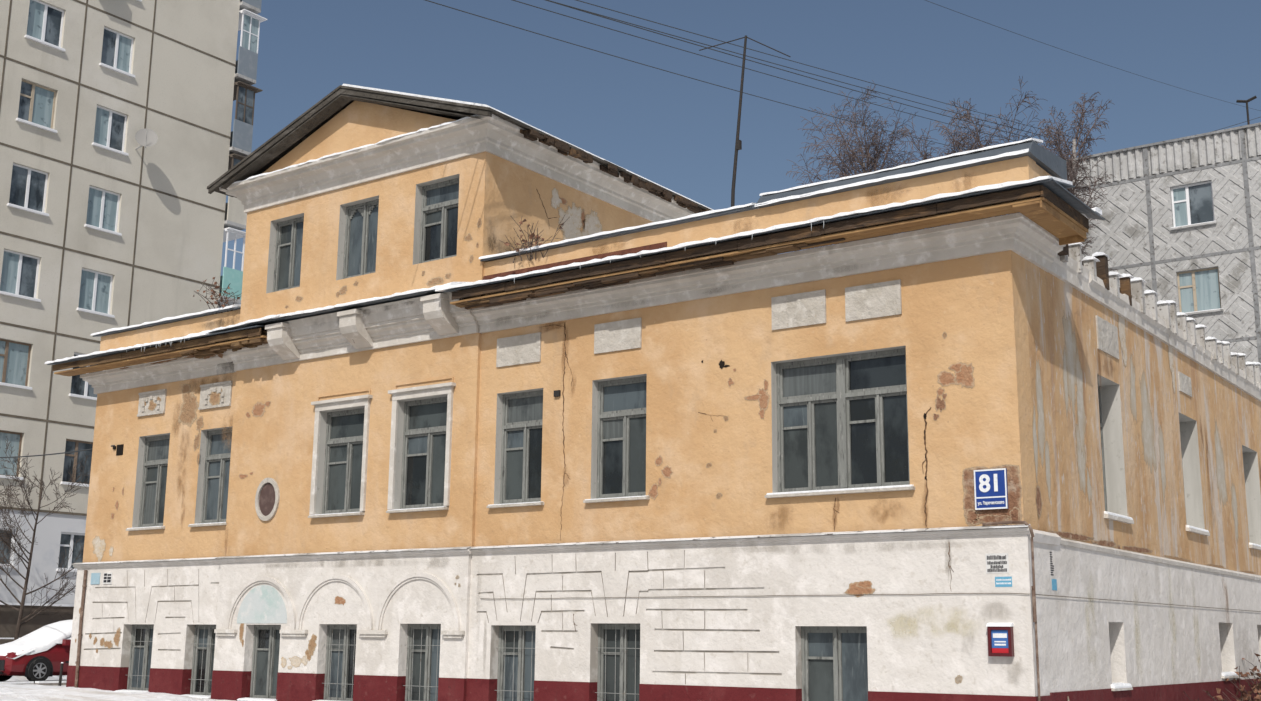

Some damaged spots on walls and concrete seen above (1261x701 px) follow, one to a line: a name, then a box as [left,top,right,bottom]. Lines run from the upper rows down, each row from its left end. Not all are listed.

peeling [551,188,603,239]
peeling [178,384,222,465]
flaking render [246,401,271,418]
crack [543,324,573,539]
flaking render [744,379,770,419]
flaking render [923,362,975,434]
flaking render [648,455,673,500]
crack [922,407,954,589]
flaking render [844,581,875,597]
peeling [75,627,121,653]
peeling [281,634,317,669]